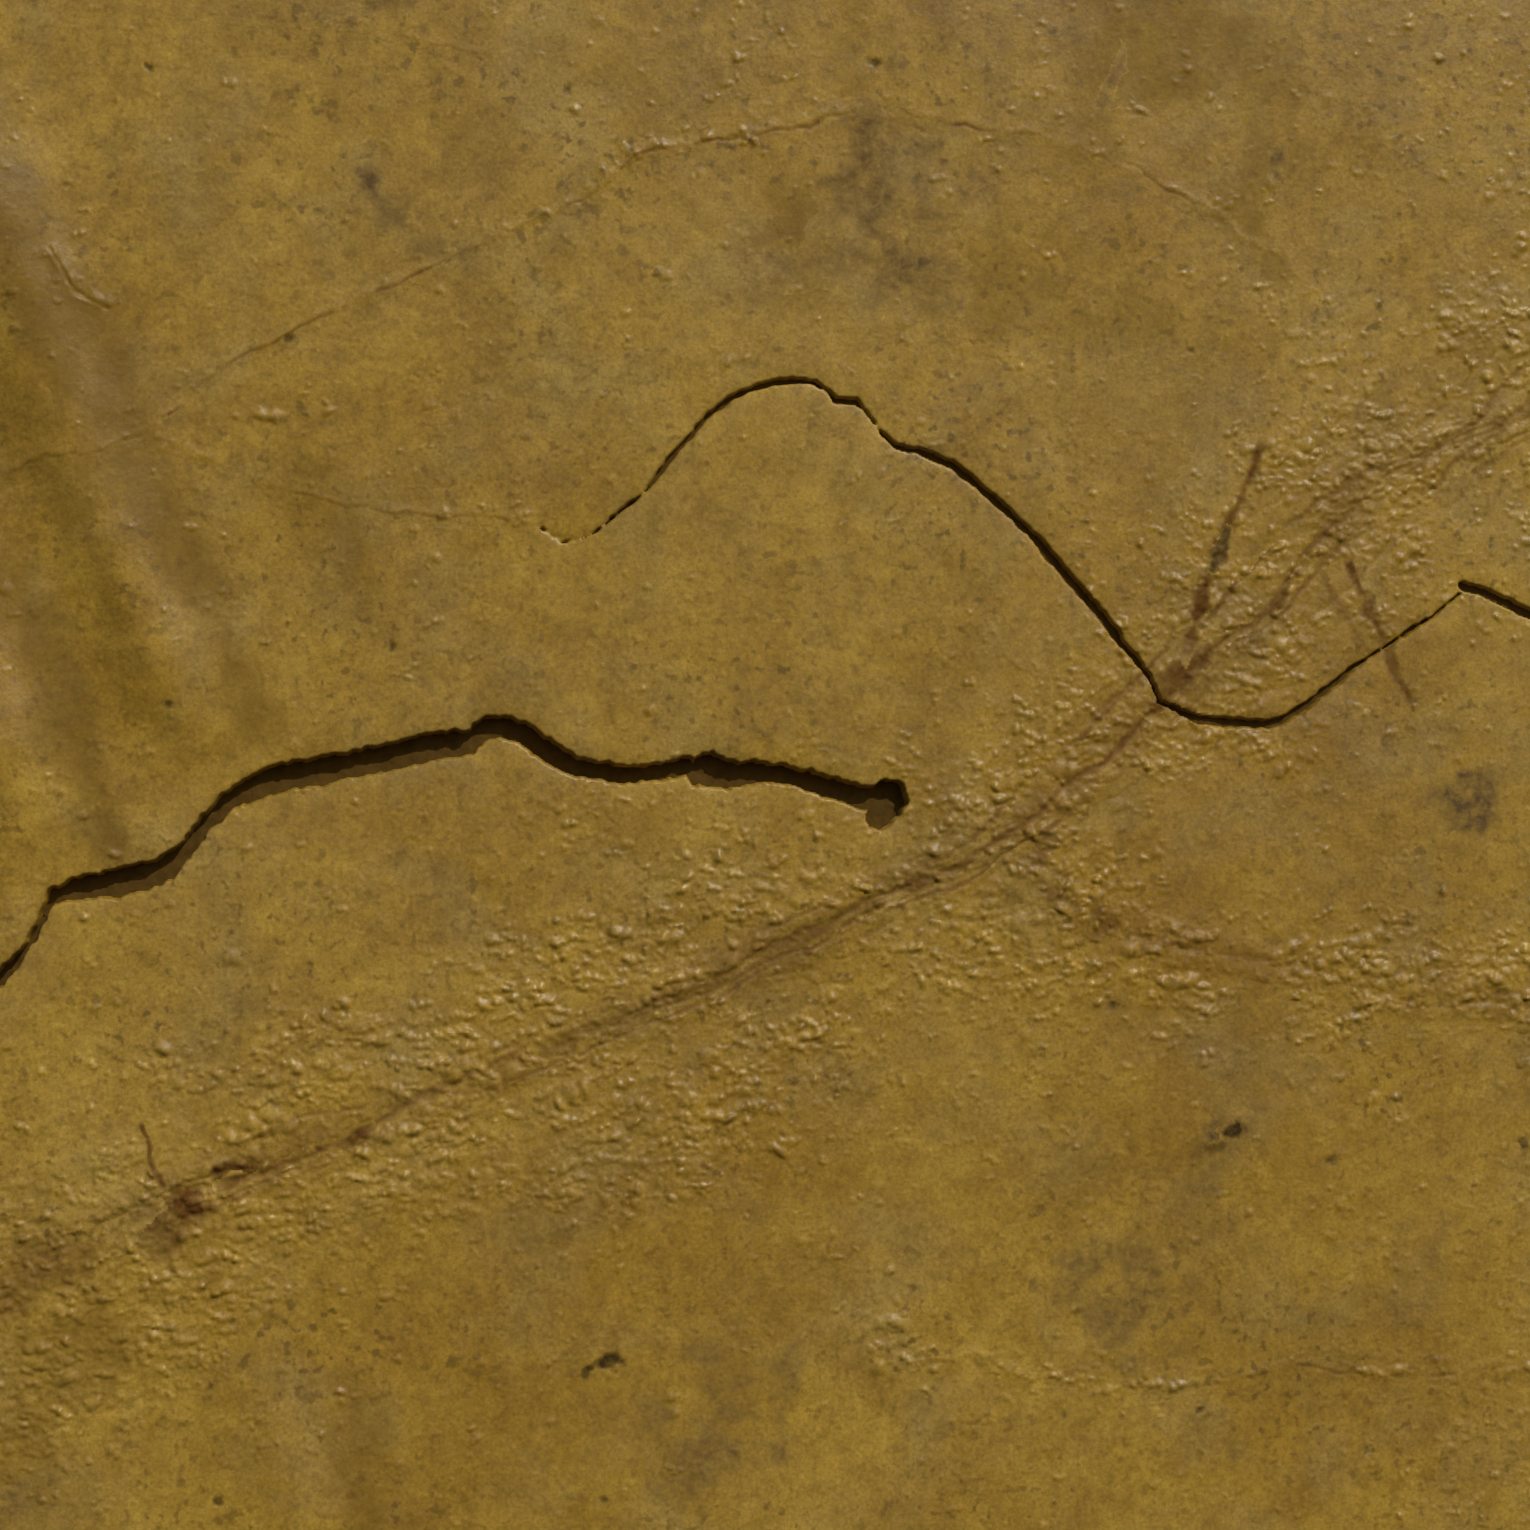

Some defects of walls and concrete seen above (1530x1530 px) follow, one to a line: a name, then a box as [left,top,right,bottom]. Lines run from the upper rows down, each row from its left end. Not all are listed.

crack [597,380,1428,729]
crack [1458,582,1530,619]
crack [0,718,904,986]